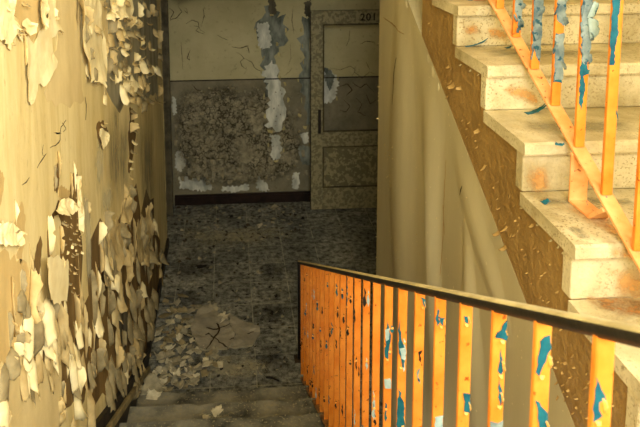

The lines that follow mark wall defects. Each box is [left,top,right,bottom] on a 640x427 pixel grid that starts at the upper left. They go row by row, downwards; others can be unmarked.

crack [22,120,66,185]
peeling [0,0,177,427]
crack [169,8,260,71]
peeling [174,0,312,193]